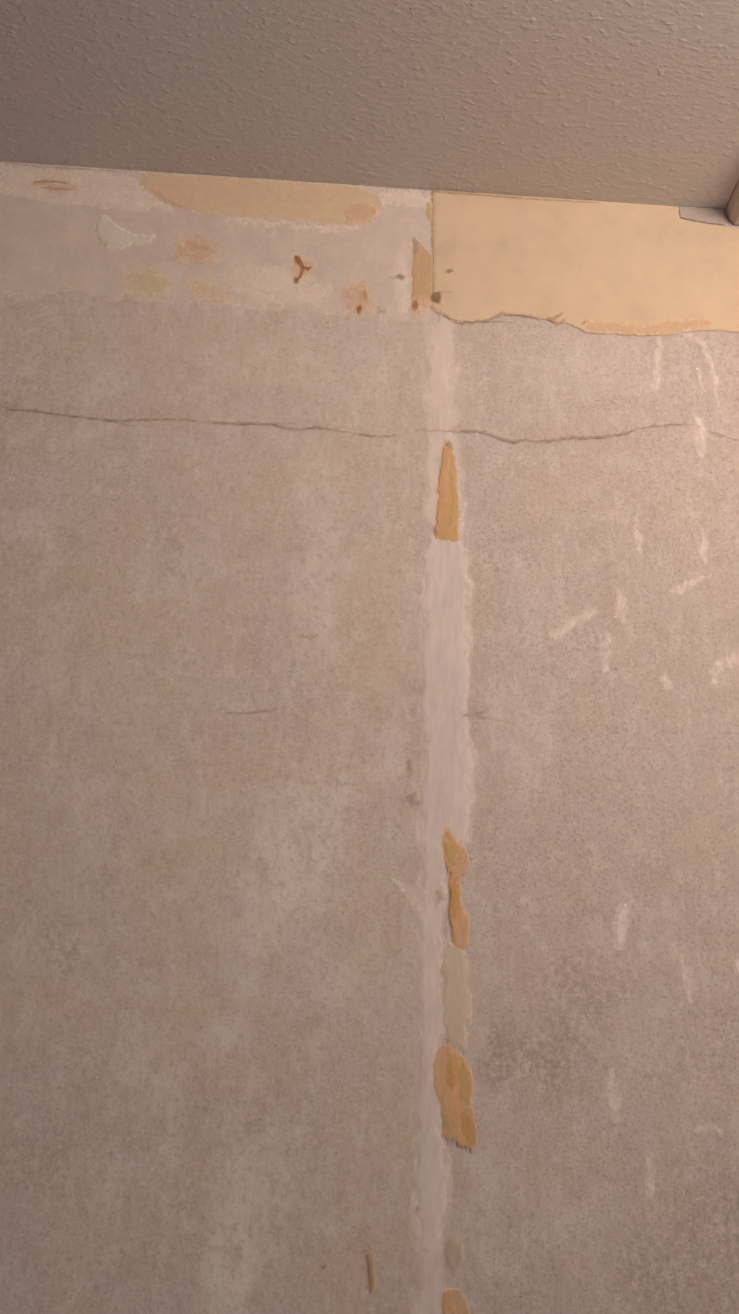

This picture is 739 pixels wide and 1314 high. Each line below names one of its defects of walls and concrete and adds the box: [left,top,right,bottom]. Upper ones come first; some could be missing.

corrosion [292,256,312,283]
peeling [0,161,739,336]
crack [10,407,681,443]
peeling [435,441,460,542]
peeling [444,827,470,950]
peeling [433,1042,478,1152]
peeling [444,1288,471,1314]